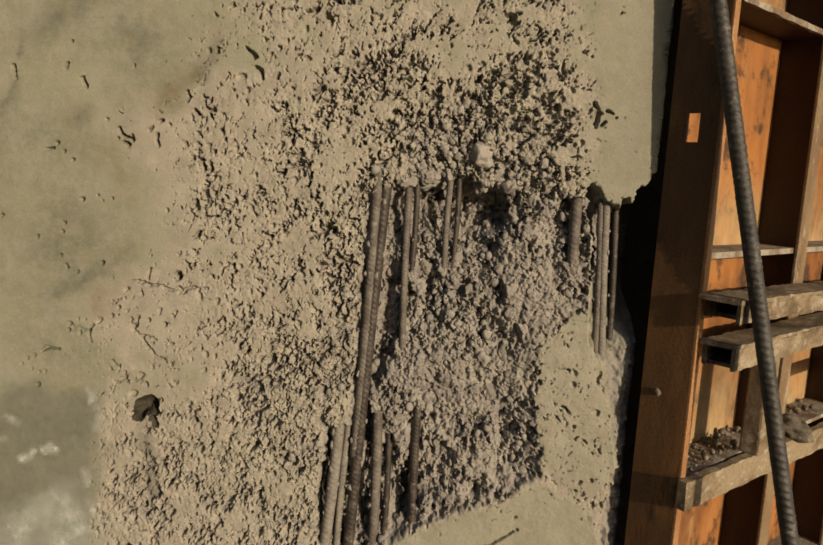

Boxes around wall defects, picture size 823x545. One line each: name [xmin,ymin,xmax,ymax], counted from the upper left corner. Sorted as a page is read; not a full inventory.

crack [129,267,210,364]
spalling [288,97,636,545]